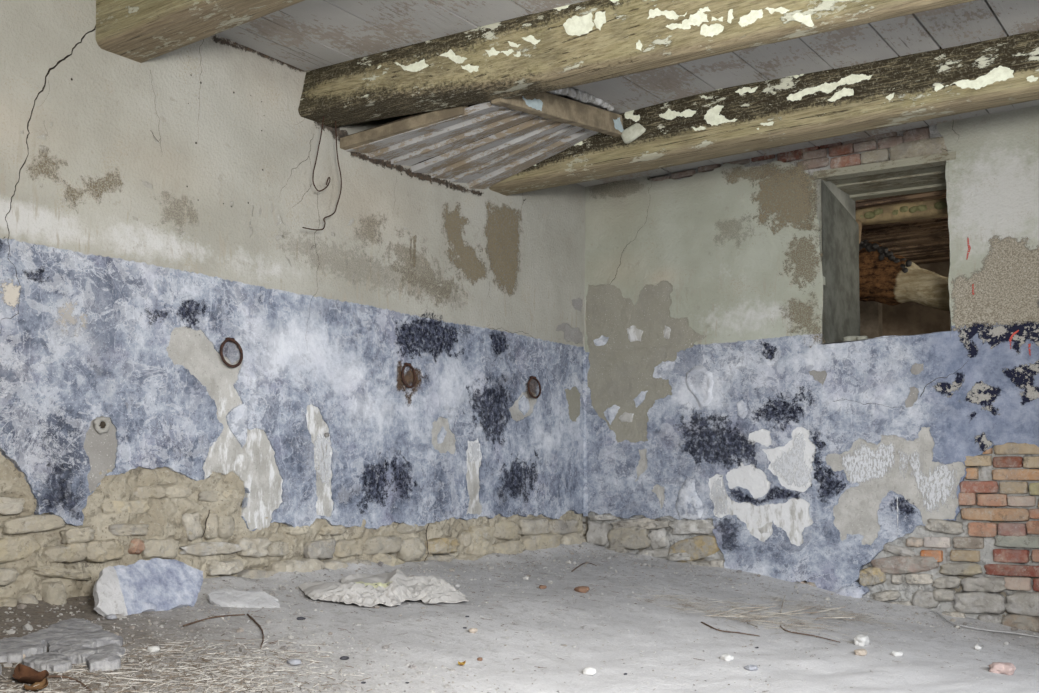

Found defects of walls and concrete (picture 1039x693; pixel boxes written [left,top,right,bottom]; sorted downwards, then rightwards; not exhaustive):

peeling [647,7,814,37]
peeling [659,88,737,131]
peeling [787,74,872,102]
peeling [934,66,1038,92]
crack [0,26,96,333]
damp [395,310,470,362]
damp [489,332,510,355]
rust [397,360,427,403]
damp [352,450,422,523]
damp [463,375,541,514]
flaking render [0,321,1039,632]
damp [675,385,958,551]